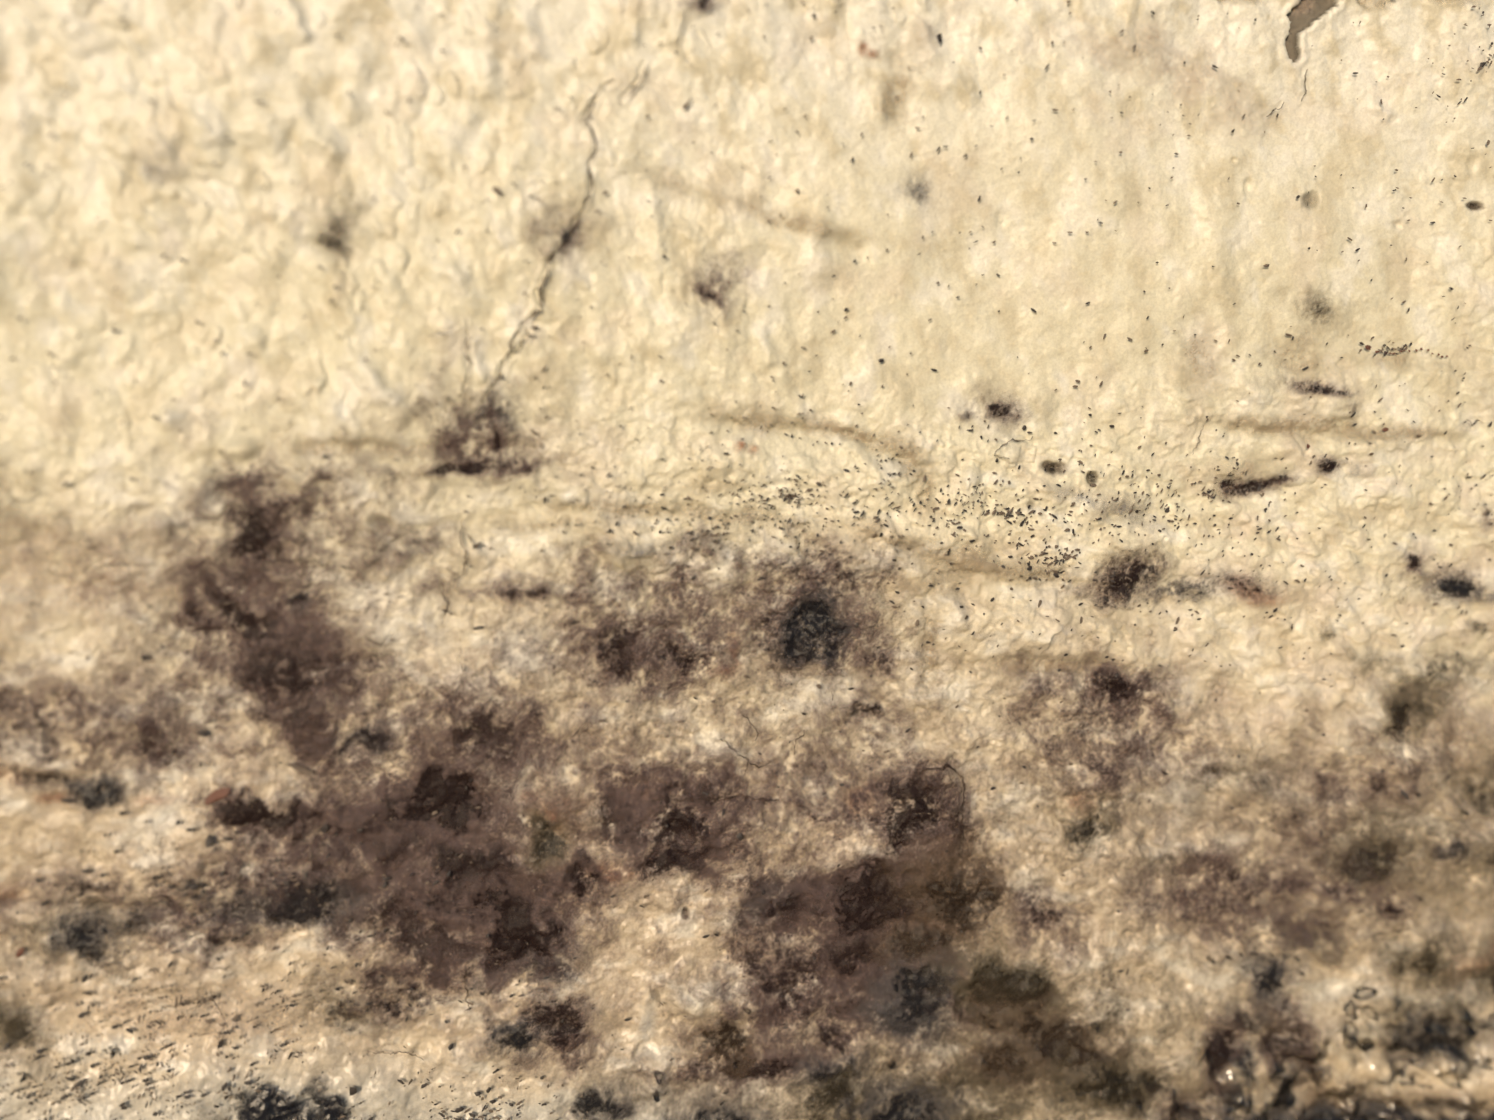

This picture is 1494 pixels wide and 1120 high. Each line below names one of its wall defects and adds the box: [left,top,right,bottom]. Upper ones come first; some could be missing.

spalling [1285,0,1335,62]
crack [428,65,647,421]
damp [1233,349,1356,434]
damp [805,422,930,492]
damp [1220,465,1292,499]
damp [1318,458,1339,473]
damp [0,689,188,811]
damp [44,473,1494,1120]
damp [0,1008,34,1053]